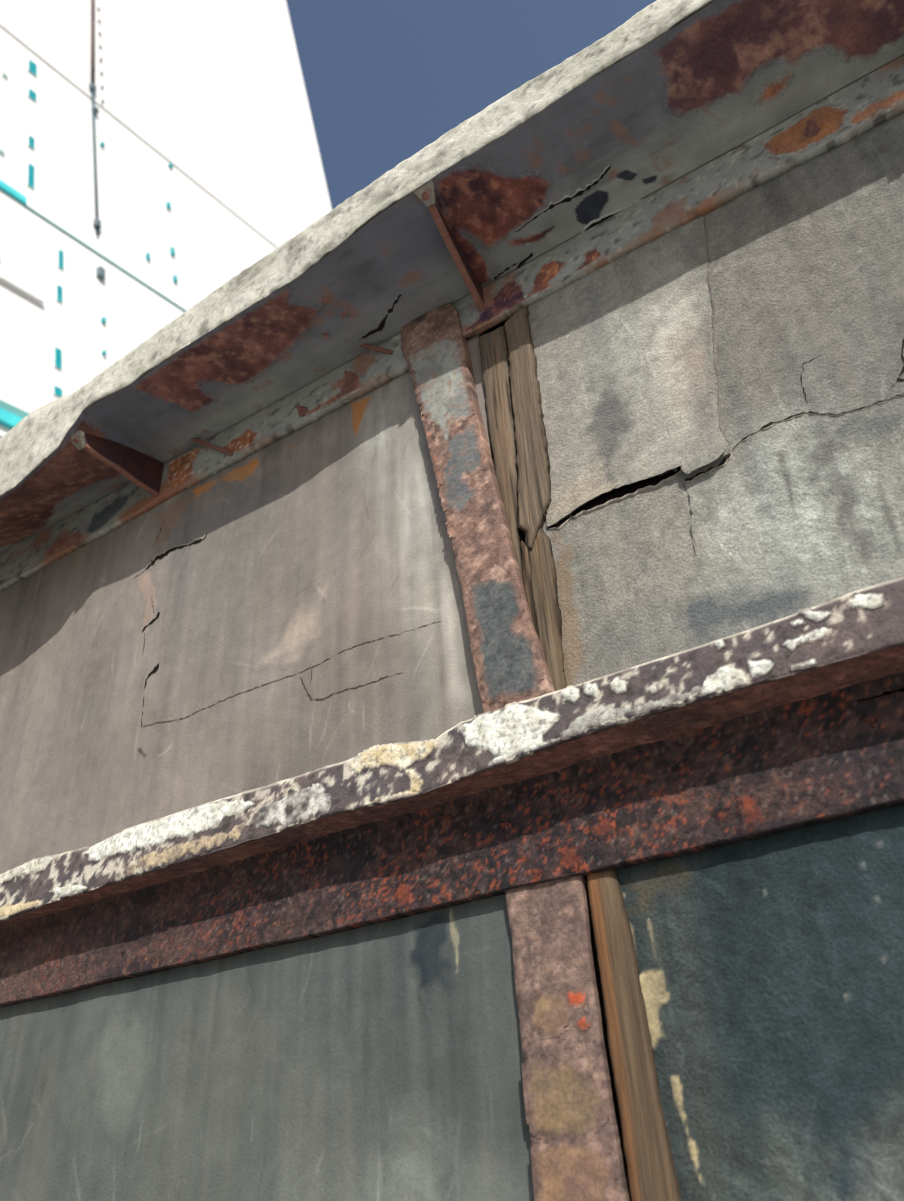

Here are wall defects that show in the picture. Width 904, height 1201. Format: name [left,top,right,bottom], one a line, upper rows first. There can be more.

rust [652,0,904,120]
rust [433,163,605,336]
crack [494,165,643,280]
rust [127,284,351,415]
crack [359,294,402,340]
crack [546,237,904,554]
crack [134,520,439,727]
peeling [82,781,333,877]
peeling [0,882,88,919]
peeling [629,918,672,1051]
rust [521,1058,617,1201]
peeling [661,1072,707,1189]